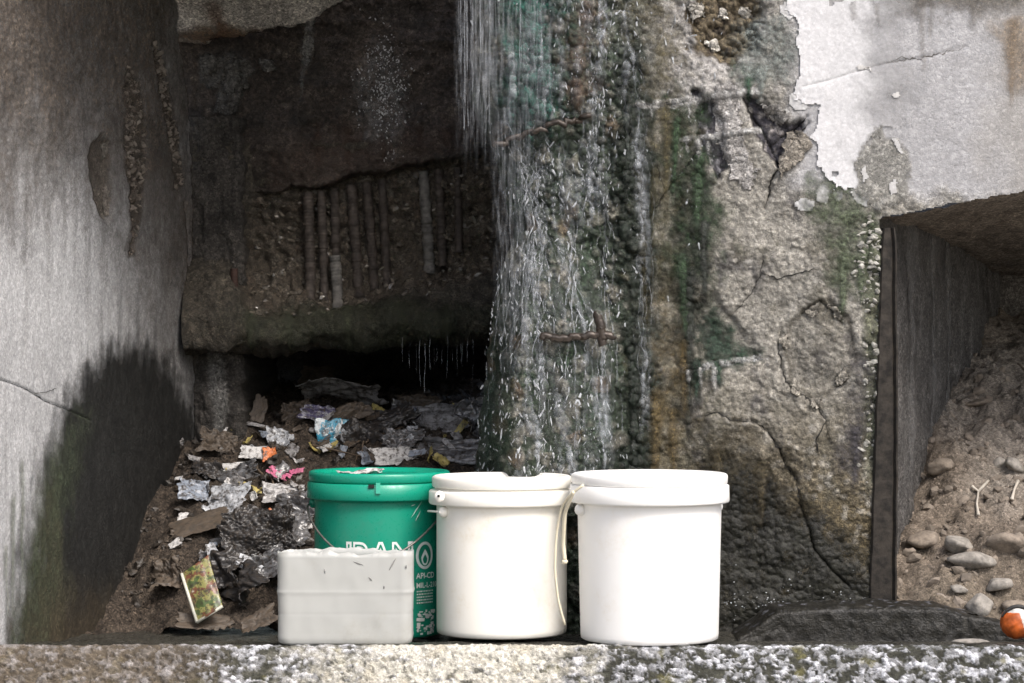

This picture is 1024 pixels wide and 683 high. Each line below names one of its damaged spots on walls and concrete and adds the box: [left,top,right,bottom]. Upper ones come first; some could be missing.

spalling [124,65,148,256]
spalling [153,41,185,191]
damp [508,62,553,144]
crack [744,100,808,203]
spalling [248,162,507,317]
peeling [685,0,911,484]
corrosion [538,311,617,347]
crack [778,332,828,456]
damp [5,343,195,644]
crack [705,412,811,536]